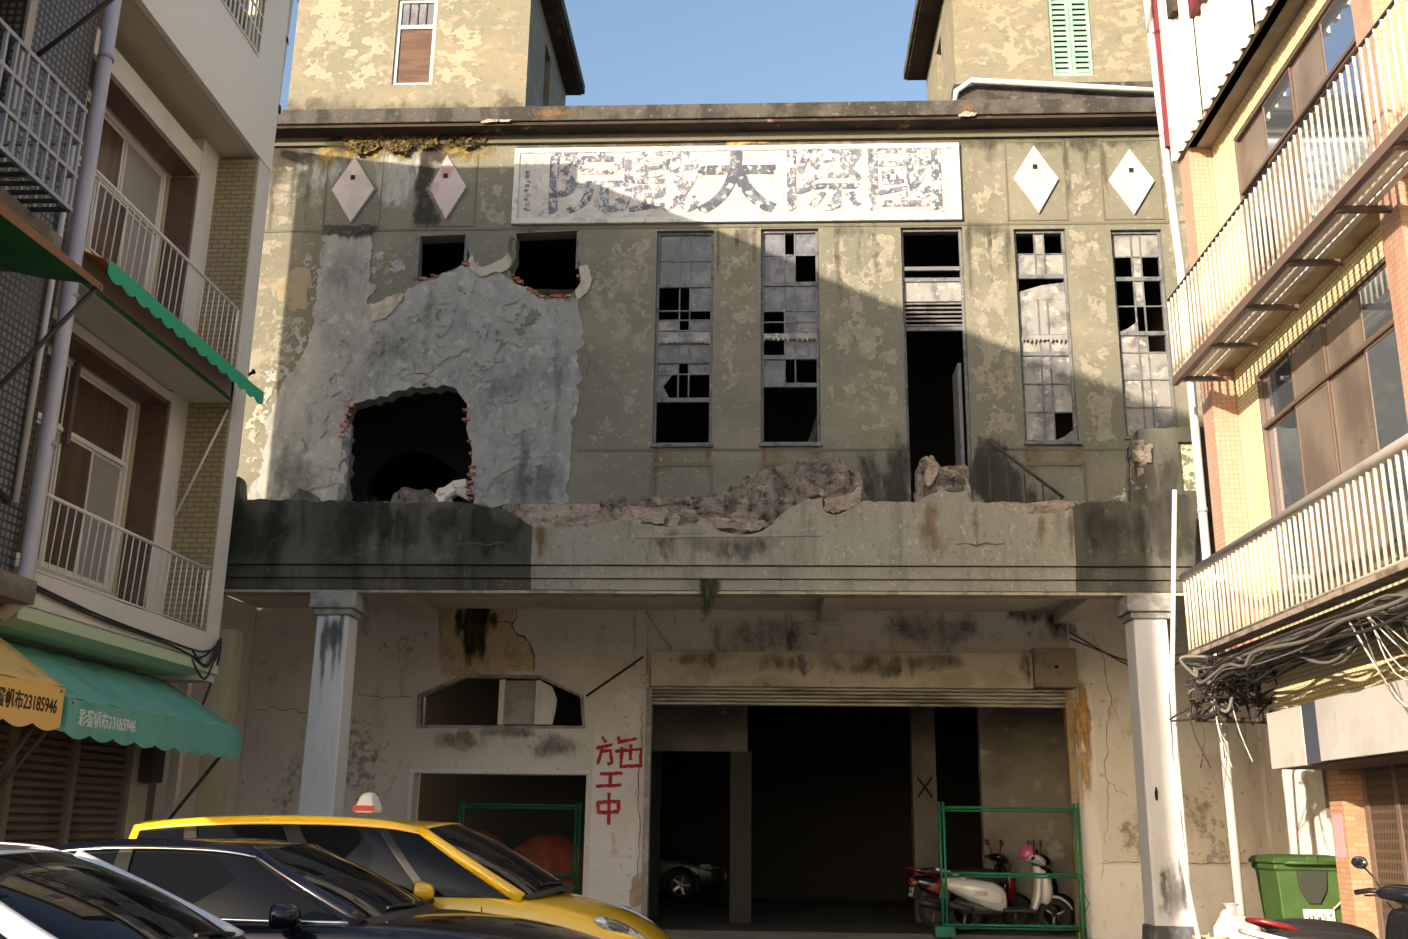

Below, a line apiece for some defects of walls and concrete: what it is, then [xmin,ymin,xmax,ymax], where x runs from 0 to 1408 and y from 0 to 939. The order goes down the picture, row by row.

flaking render [243,166,862,533]
spalling [916,455,971,502]
water stain [229,502,291,554]
water stain [320,615,344,677]
water stain [455,608,497,660]
flaking render [437,609,536,678]